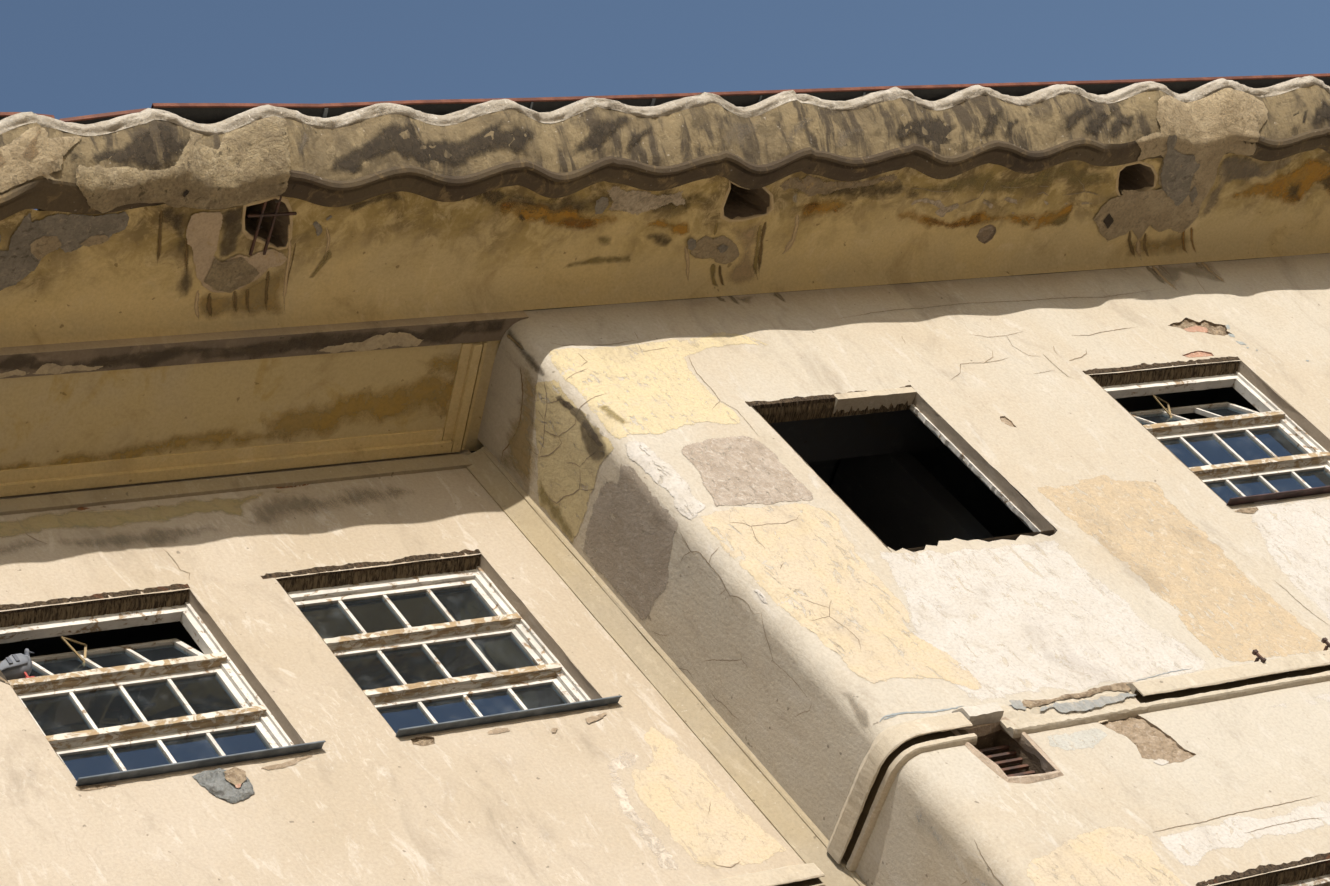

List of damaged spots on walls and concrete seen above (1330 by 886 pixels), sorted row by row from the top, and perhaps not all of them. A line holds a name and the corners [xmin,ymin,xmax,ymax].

spalling [0,116,293,293]
peeling [687,174,900,264]
spalling [1044,88,1268,242]
leakage [0,355,41,369]
leakage [57,322,543,478]
crack [501,335,760,504]
spalling [1168,318,1258,351]
leakage [540,487,572,537]
crack [730,517,798,569]
crack [679,534,812,717]
spalling [192,755,312,803]
spalling [1098,715,1196,765]